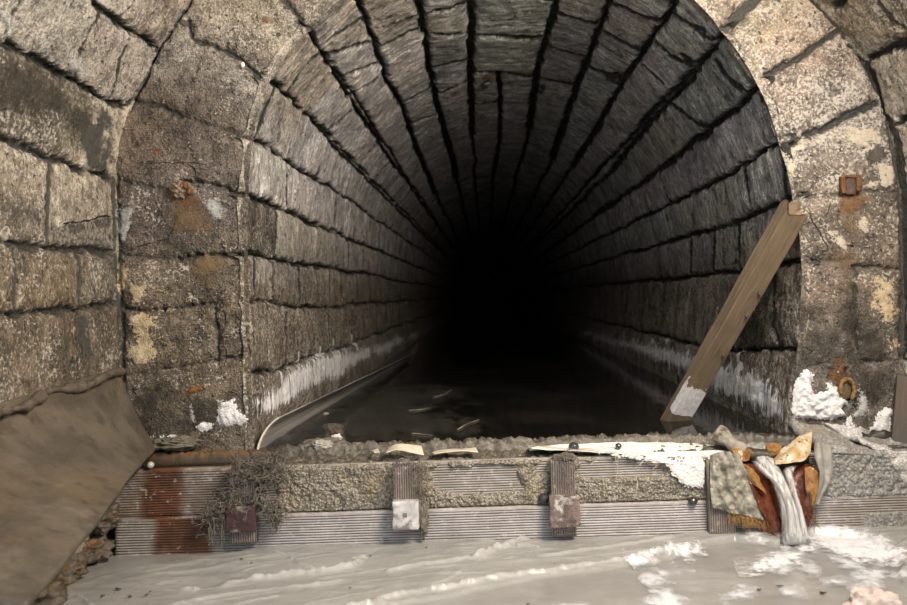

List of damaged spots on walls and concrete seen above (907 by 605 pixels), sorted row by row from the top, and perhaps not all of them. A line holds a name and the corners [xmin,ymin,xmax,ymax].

rust [840,194,865,230]
rust [194,257,222,275]
water stain [185,331,420,432]
water stain [578,274,907,482]